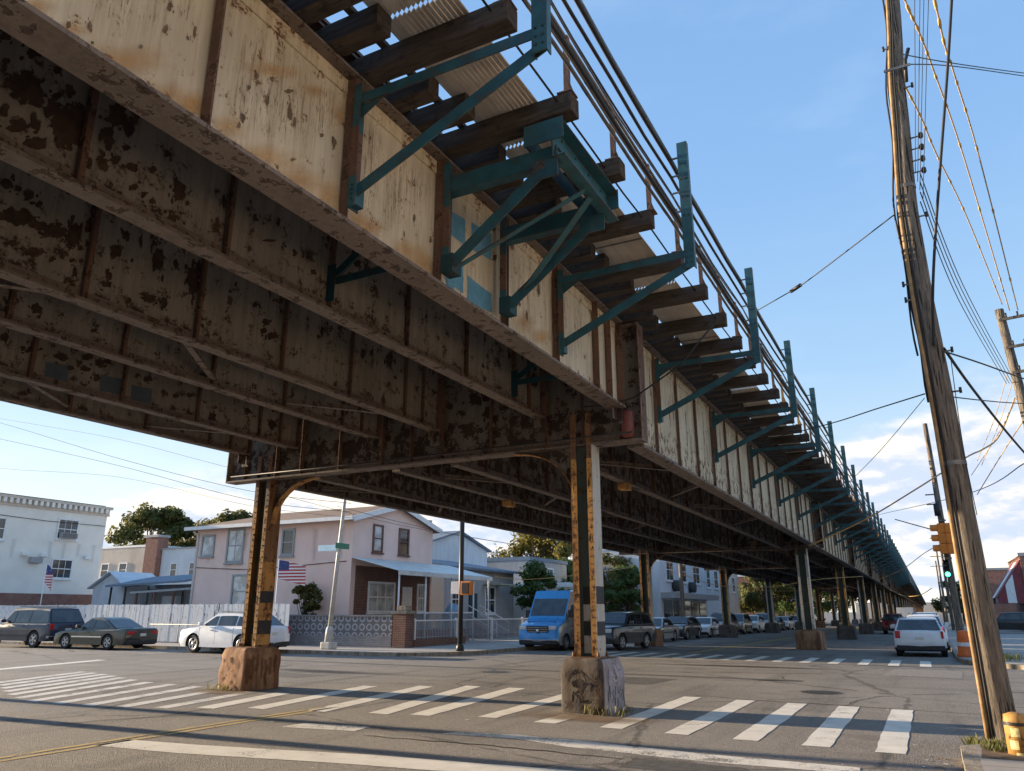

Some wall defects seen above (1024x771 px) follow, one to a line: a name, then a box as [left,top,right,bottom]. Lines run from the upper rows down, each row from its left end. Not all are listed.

peeling [247,70,298,128]
peeling [96,143,158,208]
peeling [7,212,93,282]
peeling [105,227,155,281]
peeling [53,351,113,382]